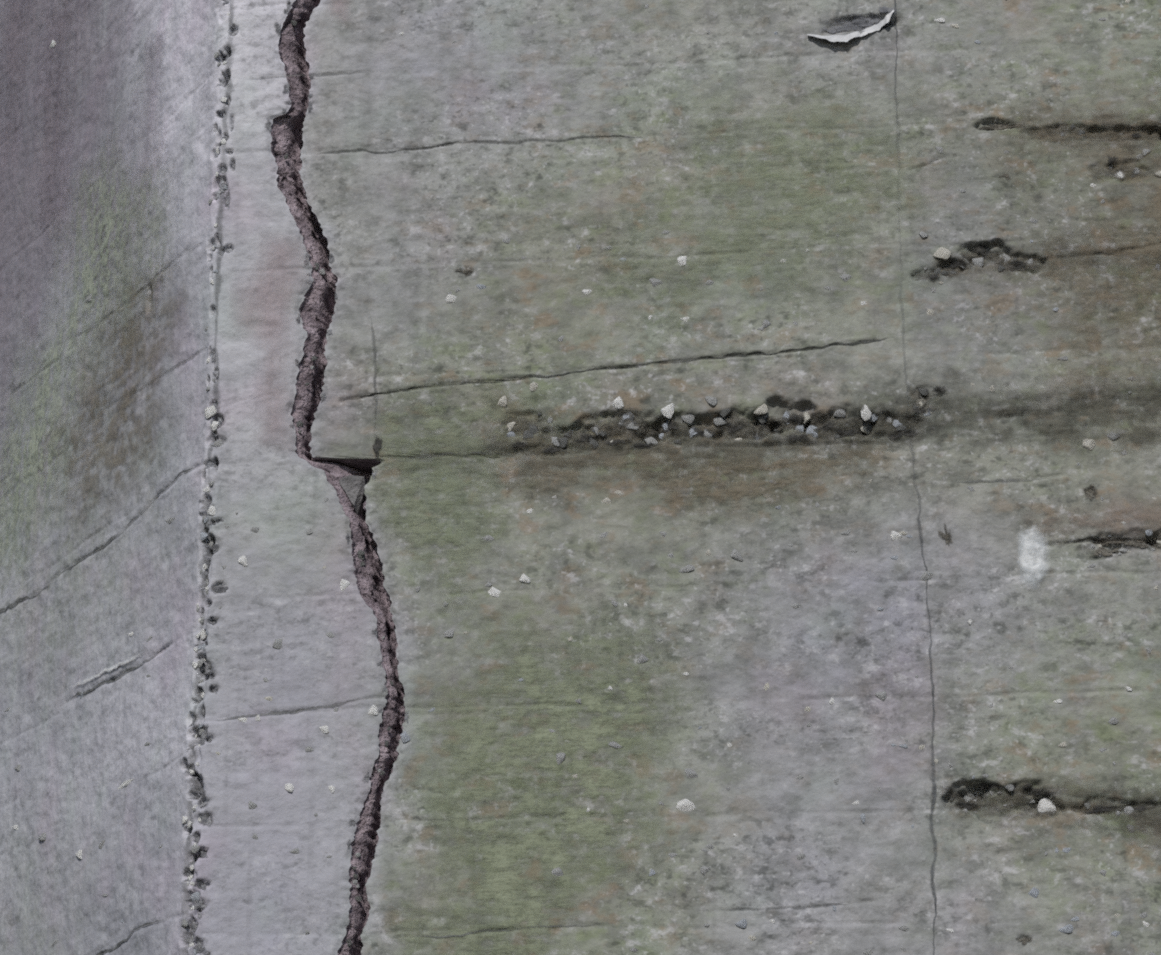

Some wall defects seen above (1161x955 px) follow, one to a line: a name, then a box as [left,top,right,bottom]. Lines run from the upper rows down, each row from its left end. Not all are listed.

peeling [807,6,895,43]
leakage [0,0,90,264]
crack [359,337,888,398]
spalling [557,411,663,446]
hole [710,412,823,439]
crack [224,0,627,955]